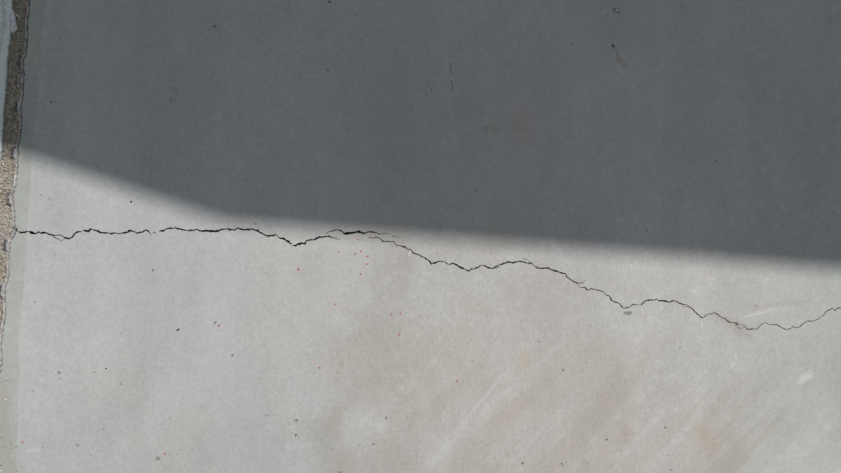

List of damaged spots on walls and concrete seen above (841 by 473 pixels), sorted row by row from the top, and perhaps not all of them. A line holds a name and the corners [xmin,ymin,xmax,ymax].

crack [13,227,841,330]